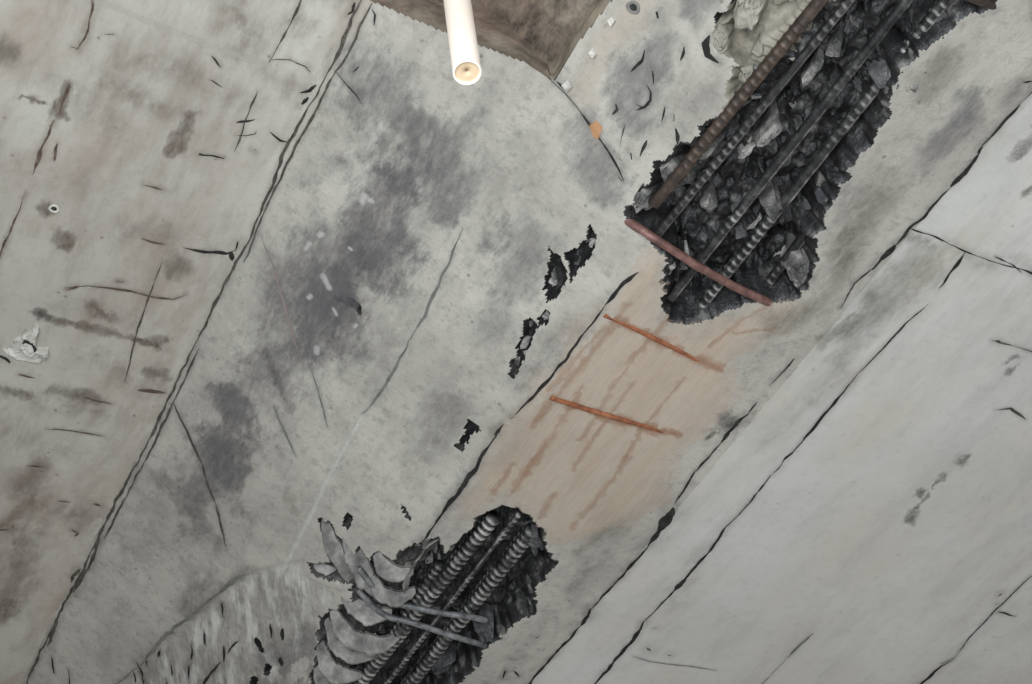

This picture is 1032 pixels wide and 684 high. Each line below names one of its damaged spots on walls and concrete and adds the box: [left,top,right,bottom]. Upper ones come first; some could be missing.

crack [0,83,70,257]
crack [26,0,376,684]
damp [261,227,408,371]
crack [361,228,463,415]
spalling [309,505,559,684]
crack [419,272,639,544]
spalling [507,224,597,379]
crack [549,78,624,182]
corrosion [486,271,756,534]
crack [503,359,794,684]
spalling [623,0,998,325]
crack [594,81,1032,684]